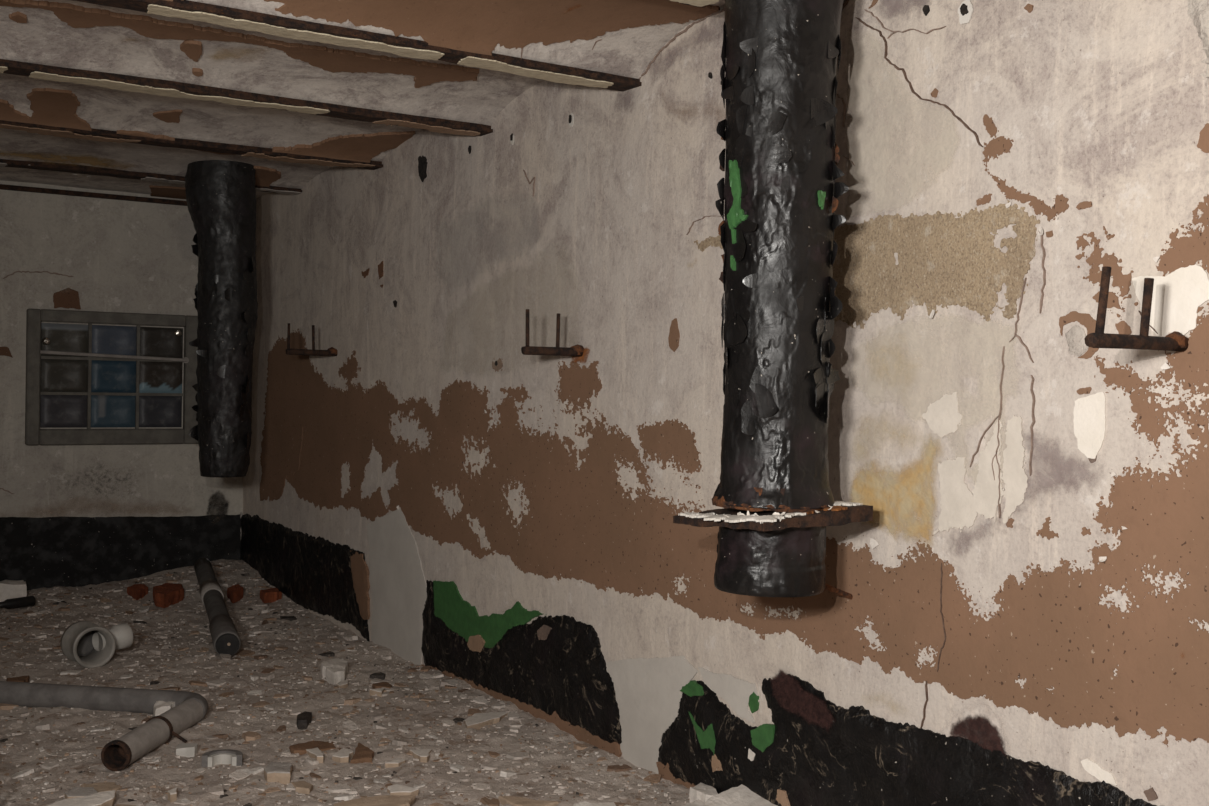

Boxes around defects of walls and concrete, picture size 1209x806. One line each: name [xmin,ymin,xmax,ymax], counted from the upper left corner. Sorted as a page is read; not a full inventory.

peeling [0,0,758,393]
crack [841,0,983,147]
flaking render [813,36,1092,423]
peeling [1153,194,1209,277]
peeling [1197,123,1209,153]
crack [970,232,1046,518]
peeling [259,226,1209,789]
damp [851,440,936,540]
crack [920,563,946,729]